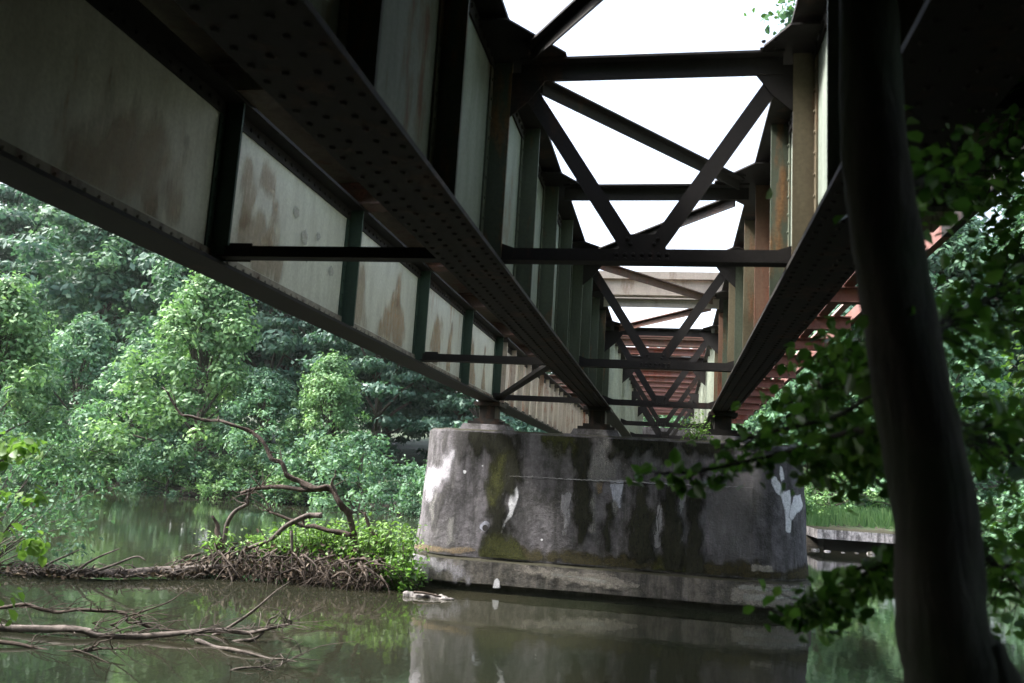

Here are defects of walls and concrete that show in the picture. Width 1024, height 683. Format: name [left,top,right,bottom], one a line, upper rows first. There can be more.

leakage [424,431,492,542]
leakage [501,487,518,533]
leakage [561,492,572,533]
leakage [587,438,763,561]